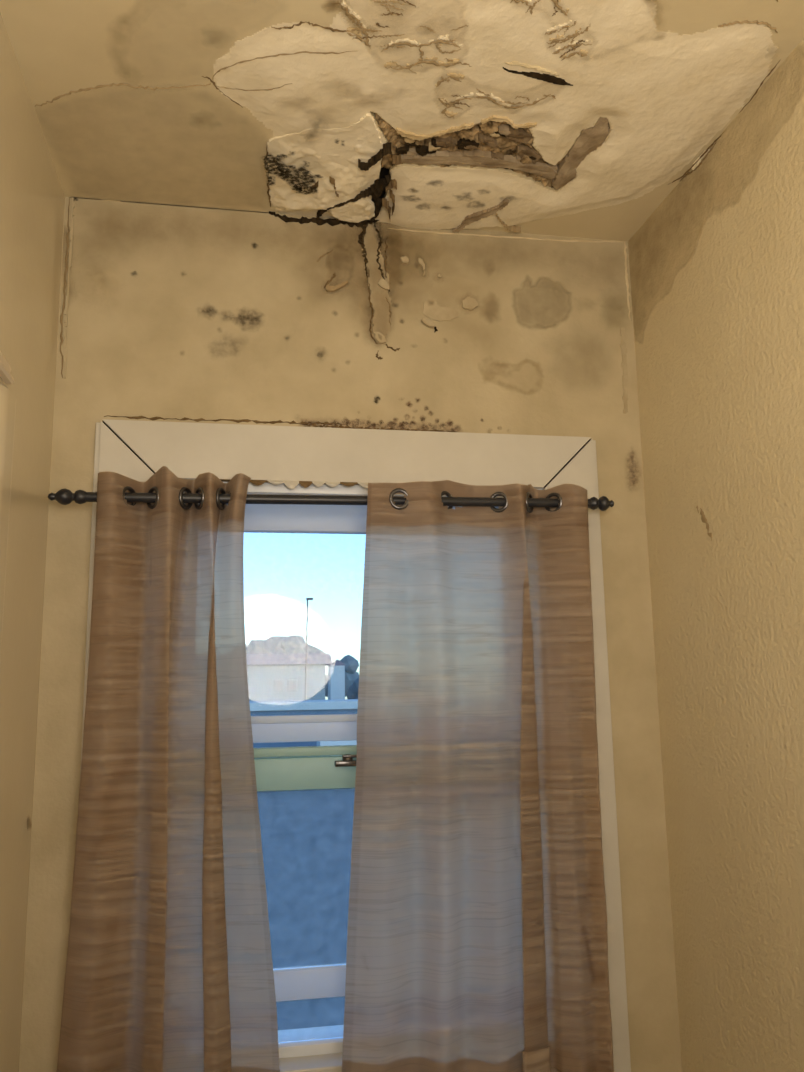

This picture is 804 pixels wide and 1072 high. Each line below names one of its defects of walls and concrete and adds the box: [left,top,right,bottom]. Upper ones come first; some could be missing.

leakage [263,152,322,194]
crack [60,147,631,414]
flaking render [202,0,777,233]
leakage [104,399,455,432]